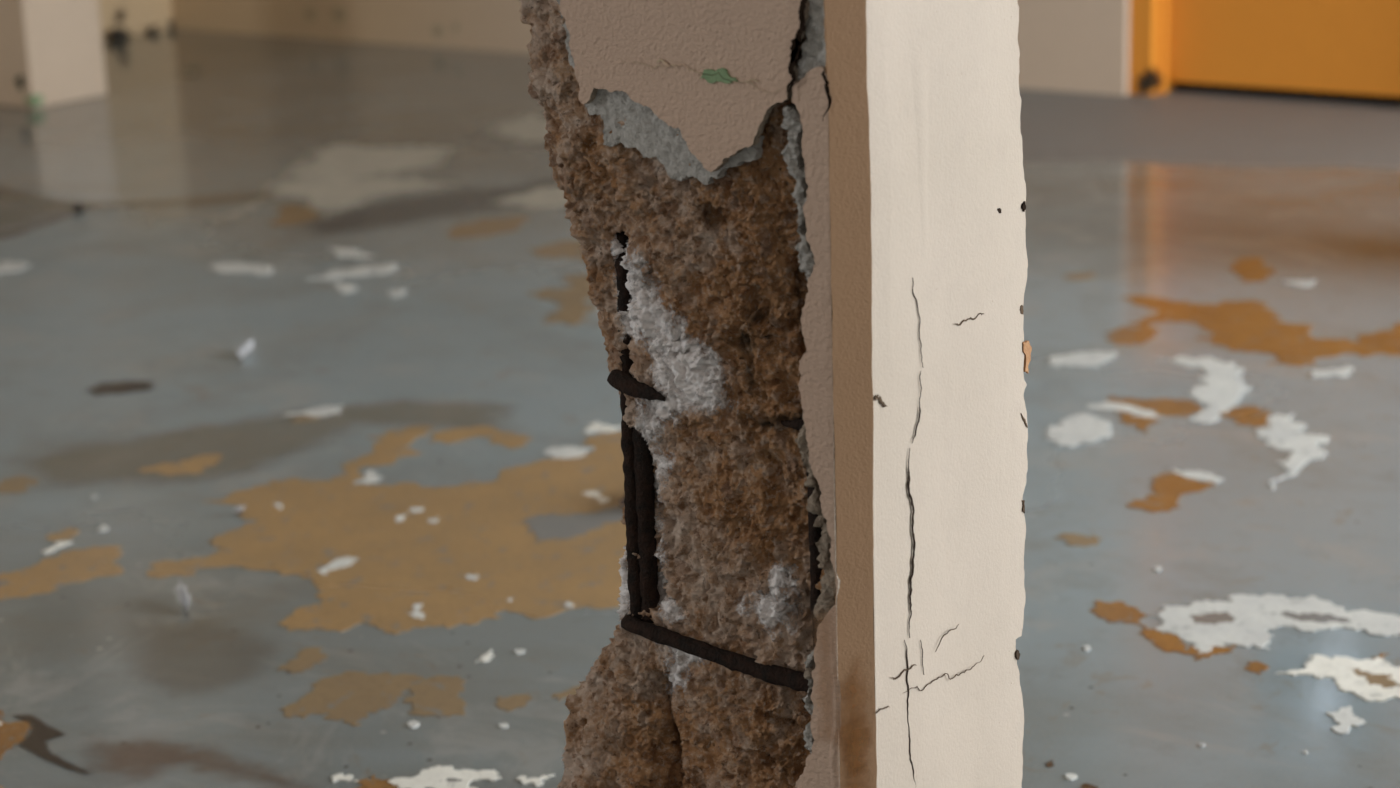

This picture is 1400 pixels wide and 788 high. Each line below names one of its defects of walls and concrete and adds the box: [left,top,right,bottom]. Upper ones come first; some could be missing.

crack [624,0,832,118]
peeling [1229,257,1278,283]
peeling [1105,295,1400,366]
spalling [137,0,836,788]
water stain [610,237,738,626]
crack [874,277,984,784]
peeling [1089,600,1237,661]
peeling [1244,661,1270,675]